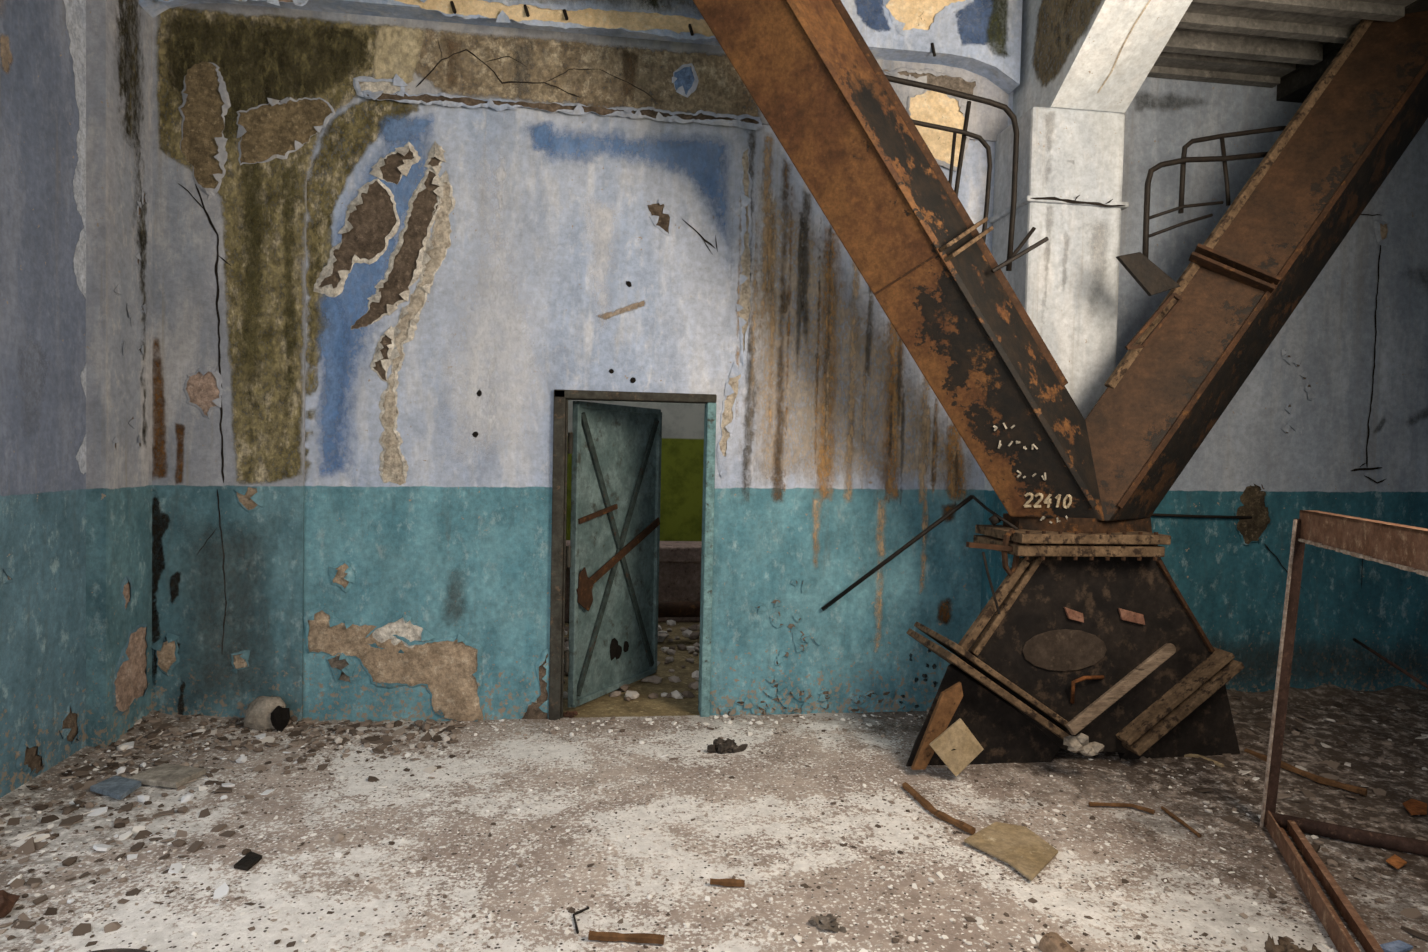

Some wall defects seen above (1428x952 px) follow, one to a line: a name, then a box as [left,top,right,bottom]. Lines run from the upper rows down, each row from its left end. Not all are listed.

peeling [385,0,715,41]
peeling [856,0,994,171]
leakage [117,0,759,484]
spalling [313,63,762,485]
rust [737,134,966,588]
spalling [328,560,355,593]
rust [937,599,951,624]
spalling [112,624,180,716]
spalling [303,605,486,722]
spalling [16,738,46,777]
spalling [59,702,82,745]